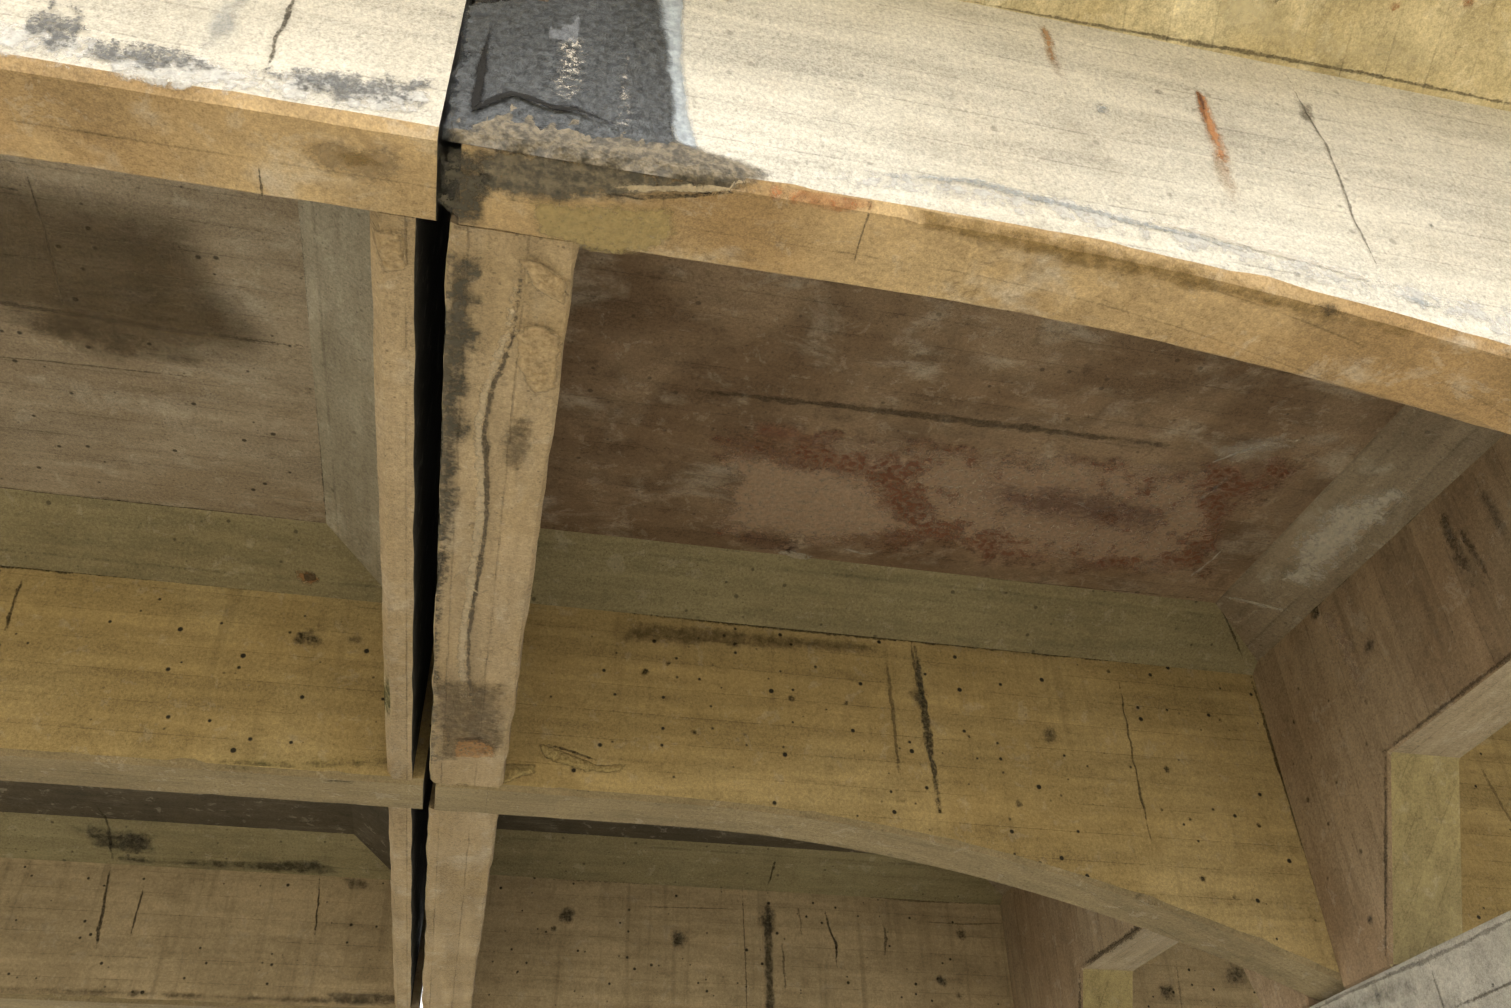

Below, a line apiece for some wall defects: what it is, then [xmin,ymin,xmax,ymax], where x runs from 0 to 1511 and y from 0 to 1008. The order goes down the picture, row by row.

crack [265,0,294,70]
peeling [557,41,584,96]
corrosion [1042,27,1055,62]
corrosion [1196,92,1226,161]
crack [1295,92,1376,262]
damp [0,197,241,341]
damp [88,827,147,862]
damp [186,861,327,874]